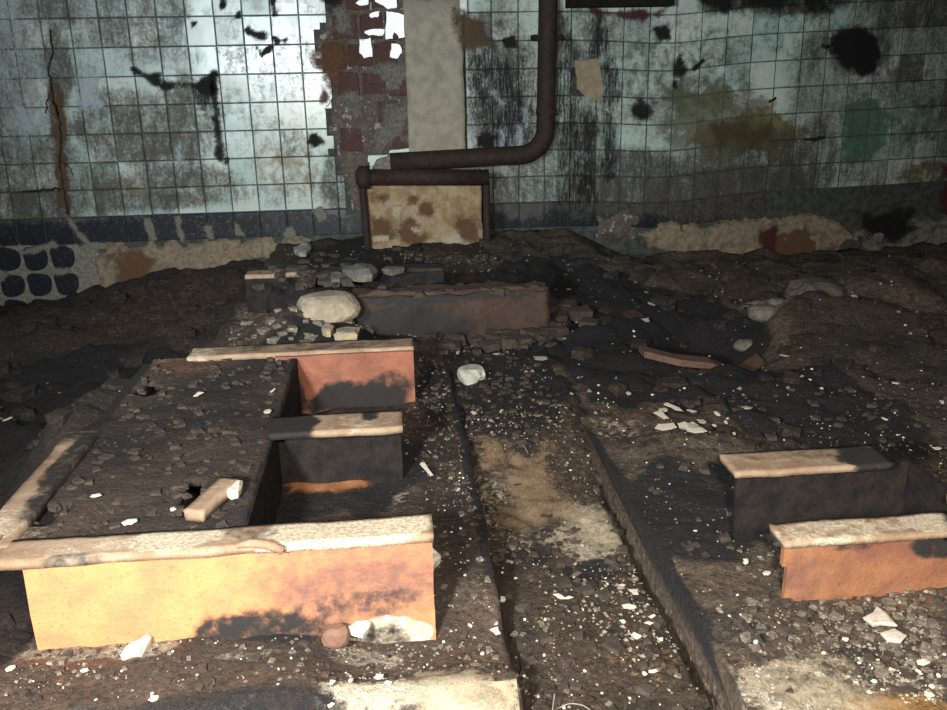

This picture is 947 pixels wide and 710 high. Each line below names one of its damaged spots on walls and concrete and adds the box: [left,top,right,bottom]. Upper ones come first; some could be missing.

crack [22,29,73,215]
leakage [187,70,225,162]
peeling [322,0,409,169]
rust [452,7,494,51]
leakage [477,107,533,147]
leakage [502,35,517,48]
leakage [574,10,627,207]
spalling [0,216,318,306]
spalling [441,230,465,244]
spalling [596,207,947,255]